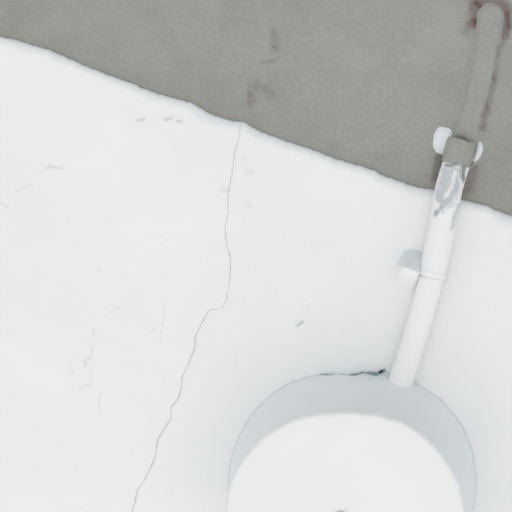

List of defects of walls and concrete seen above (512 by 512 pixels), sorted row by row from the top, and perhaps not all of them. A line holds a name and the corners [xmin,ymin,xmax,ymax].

crack [187,295,228,366]
crack [132,385,182,512]